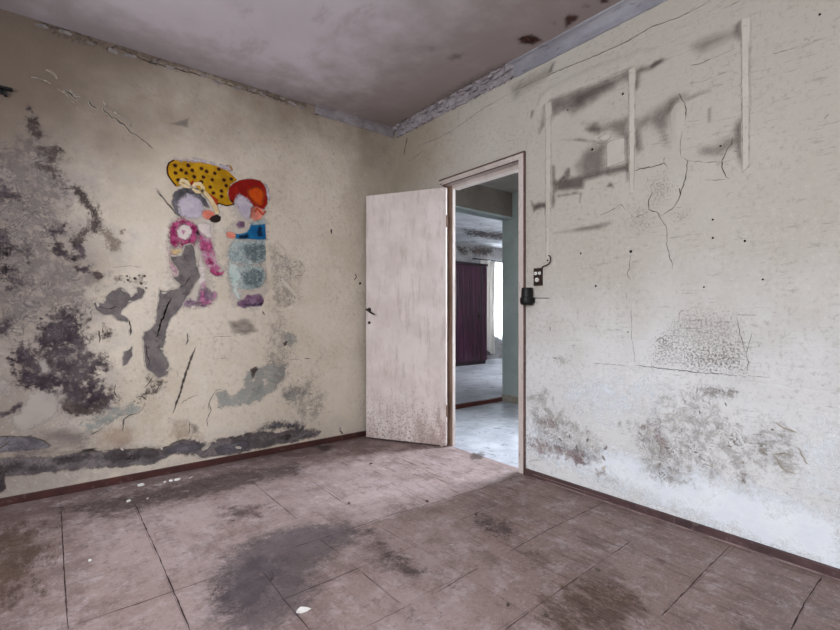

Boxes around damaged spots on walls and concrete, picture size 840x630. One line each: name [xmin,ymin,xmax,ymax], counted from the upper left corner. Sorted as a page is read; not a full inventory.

crack [32,69,153,149]
crack [601,48,735,266]
leakage [0,107,125,417]
peeling [80,243,201,433]
crack [173,333,196,413]
peeling [207,354,332,426]
leakage [257,421,305,432]
leakage [58,463,300,518]
efflorescence [528,423,840,569]